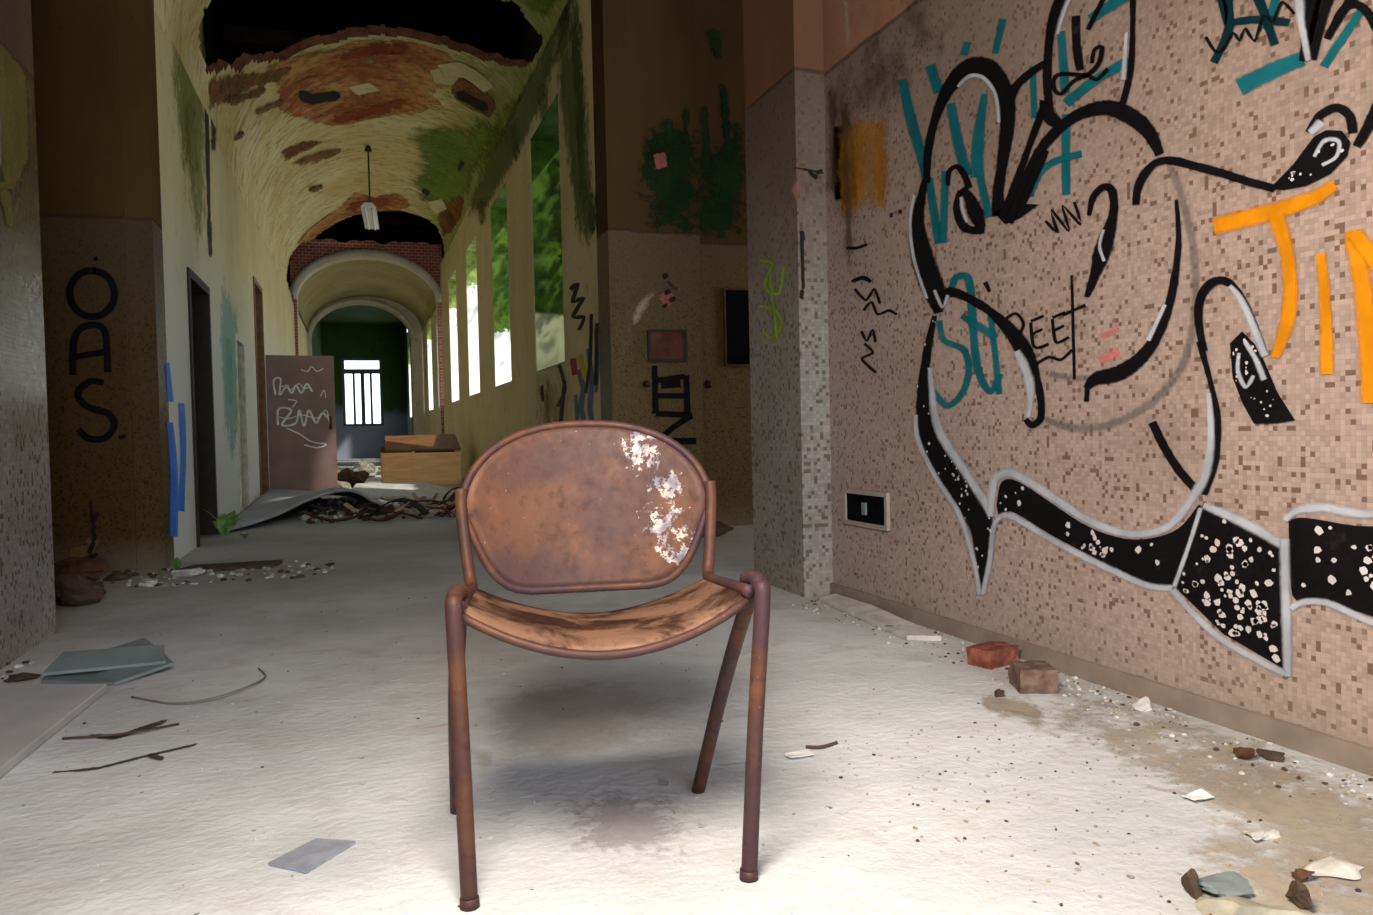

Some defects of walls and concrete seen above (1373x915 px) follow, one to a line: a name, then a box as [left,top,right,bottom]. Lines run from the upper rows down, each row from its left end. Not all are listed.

peeling [210,40,496,126]
peeling [281,141,342,165]
leakage [571,22,597,234]
leakage [664,84,733,172]
peeling [298,188,464,243]
leakage [575,798,678,850]